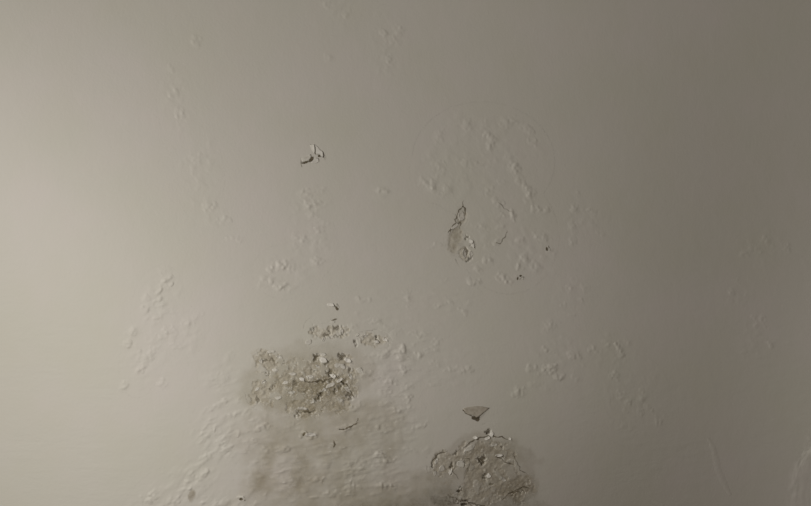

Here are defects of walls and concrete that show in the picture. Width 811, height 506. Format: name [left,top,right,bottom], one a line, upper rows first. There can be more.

peeling [444,208,480,269]
flaking render [243,303,395,424]
flaking render [426,406,543,506]